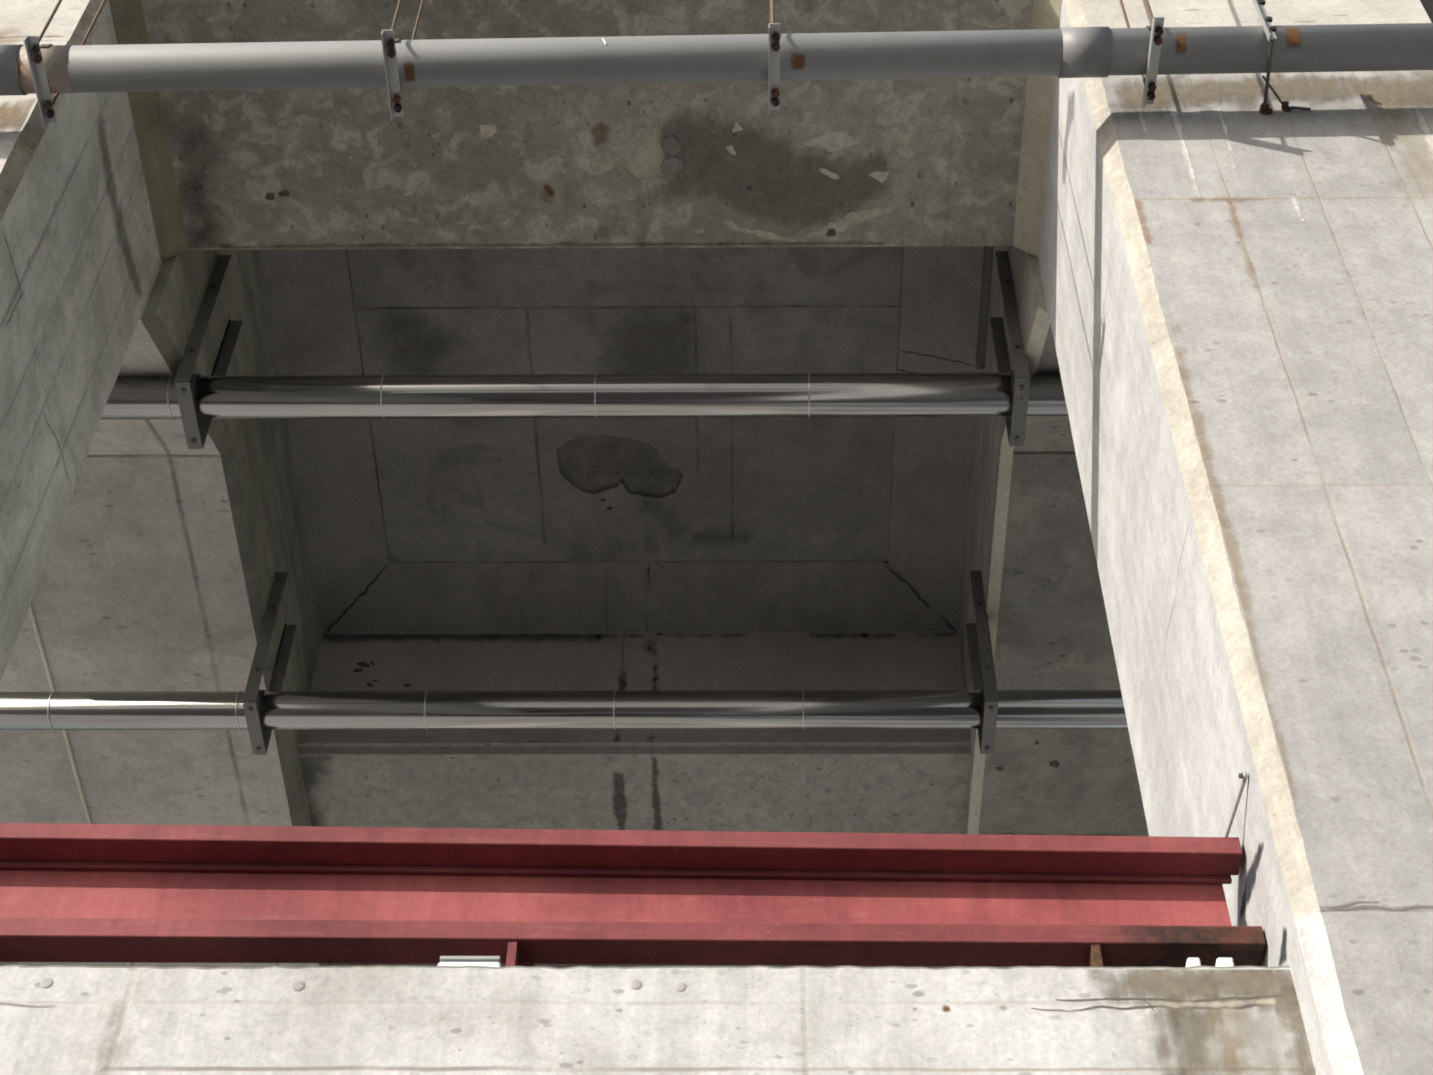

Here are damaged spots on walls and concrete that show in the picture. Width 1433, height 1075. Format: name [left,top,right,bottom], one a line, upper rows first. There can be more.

water stain [663,120,895,242]
water stain [613,773,627,830]
water stain [652,758,661,831]
water stain [1240,845,1263,917]
crack [1317,901,1433,912]
crack [1032,995,1284,1011]
water stain [1113,929,1316,1075]